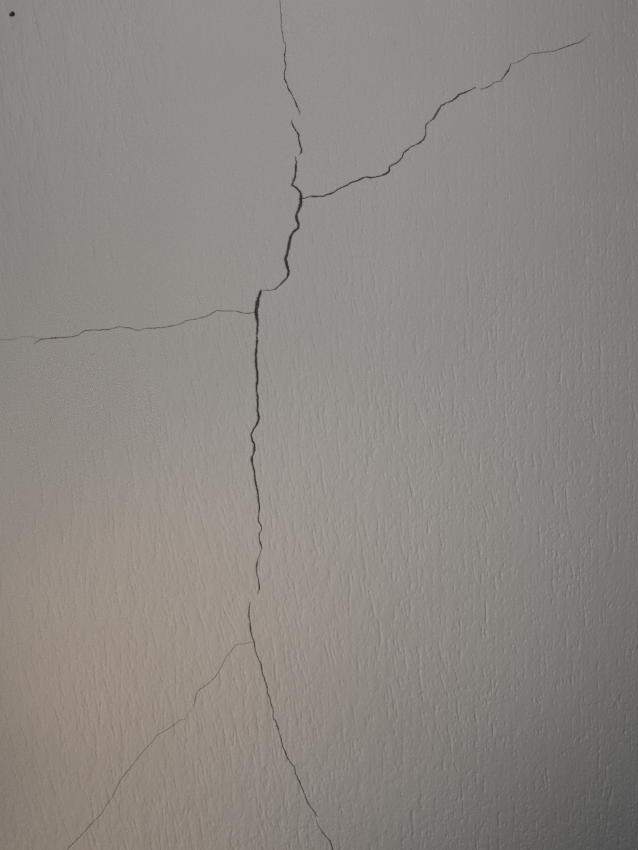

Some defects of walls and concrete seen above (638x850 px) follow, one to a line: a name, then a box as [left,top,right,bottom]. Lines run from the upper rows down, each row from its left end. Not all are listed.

crack [5,3,592,593]
crack [68,605,333,850]